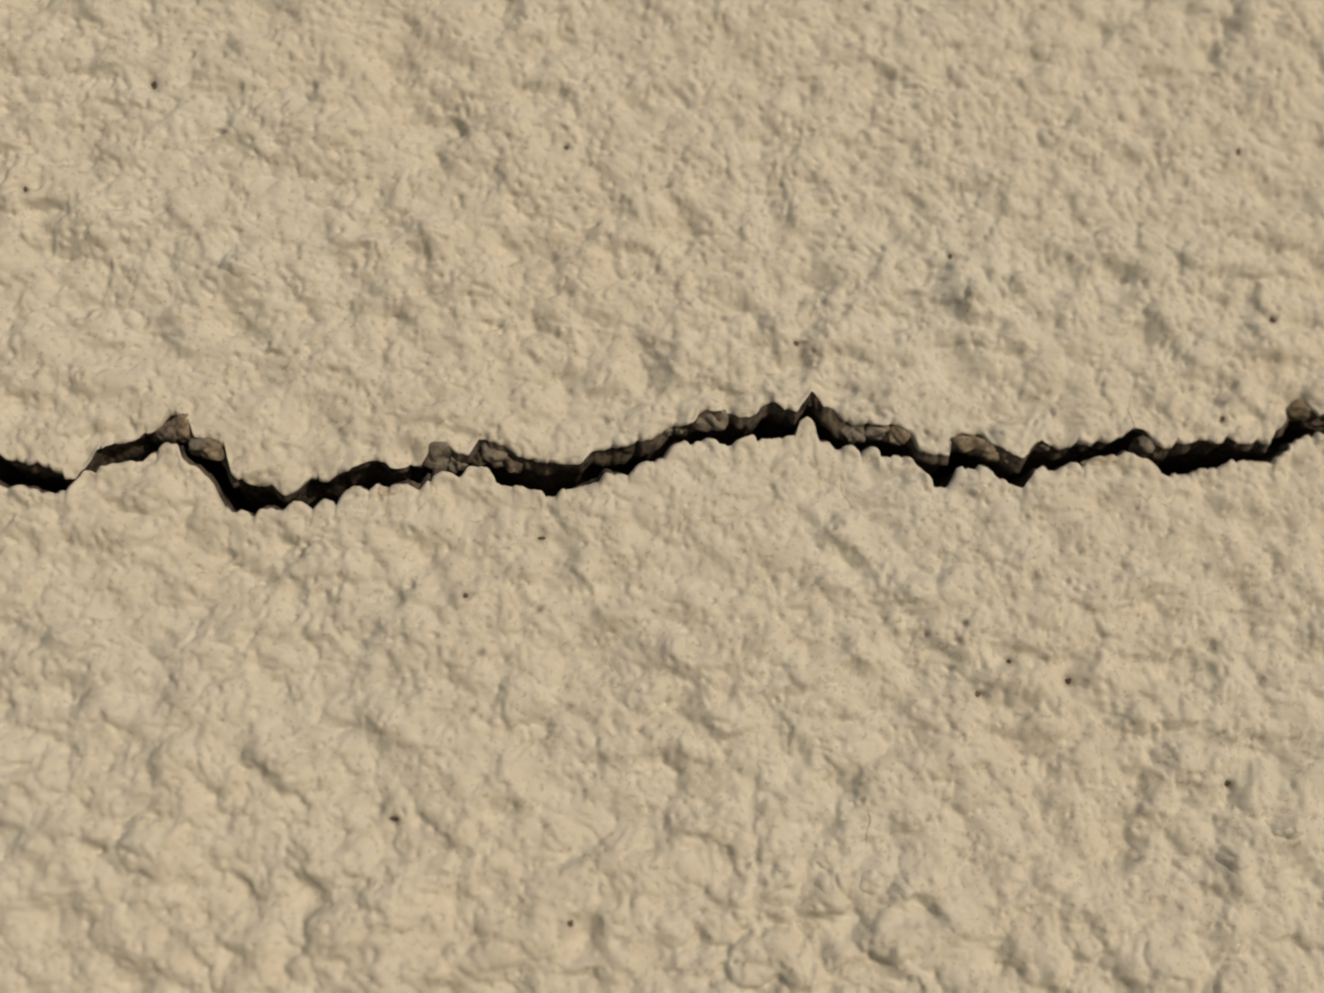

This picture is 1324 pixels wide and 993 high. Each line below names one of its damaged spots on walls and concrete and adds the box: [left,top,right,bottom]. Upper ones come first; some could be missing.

crack [0,392,1324,516]